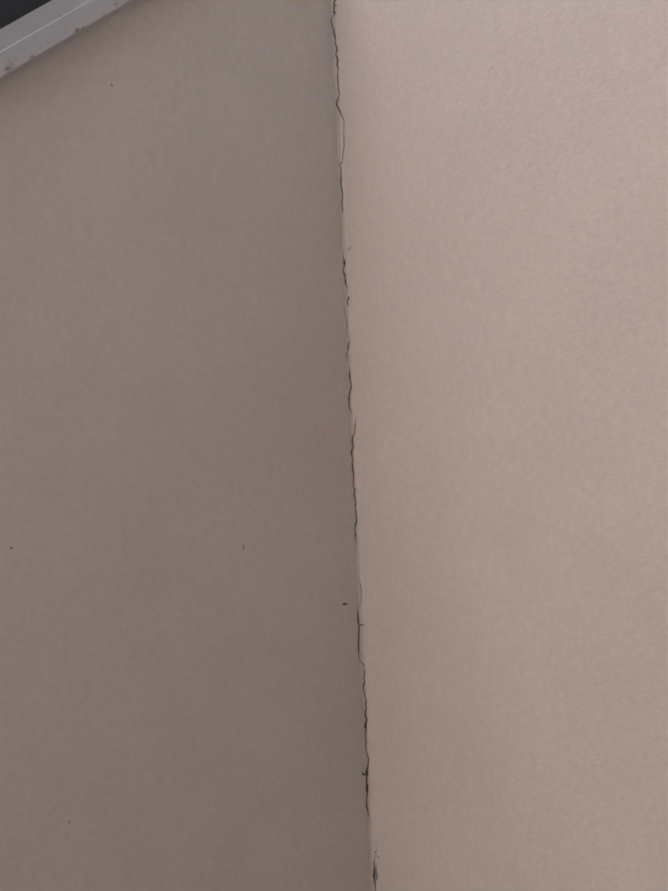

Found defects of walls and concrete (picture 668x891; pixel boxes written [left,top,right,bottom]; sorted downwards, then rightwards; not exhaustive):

crack [331,0,345,214]
crack [343,257,357,547]
crack [357,578,371,822]
crack [372,843,380,891]